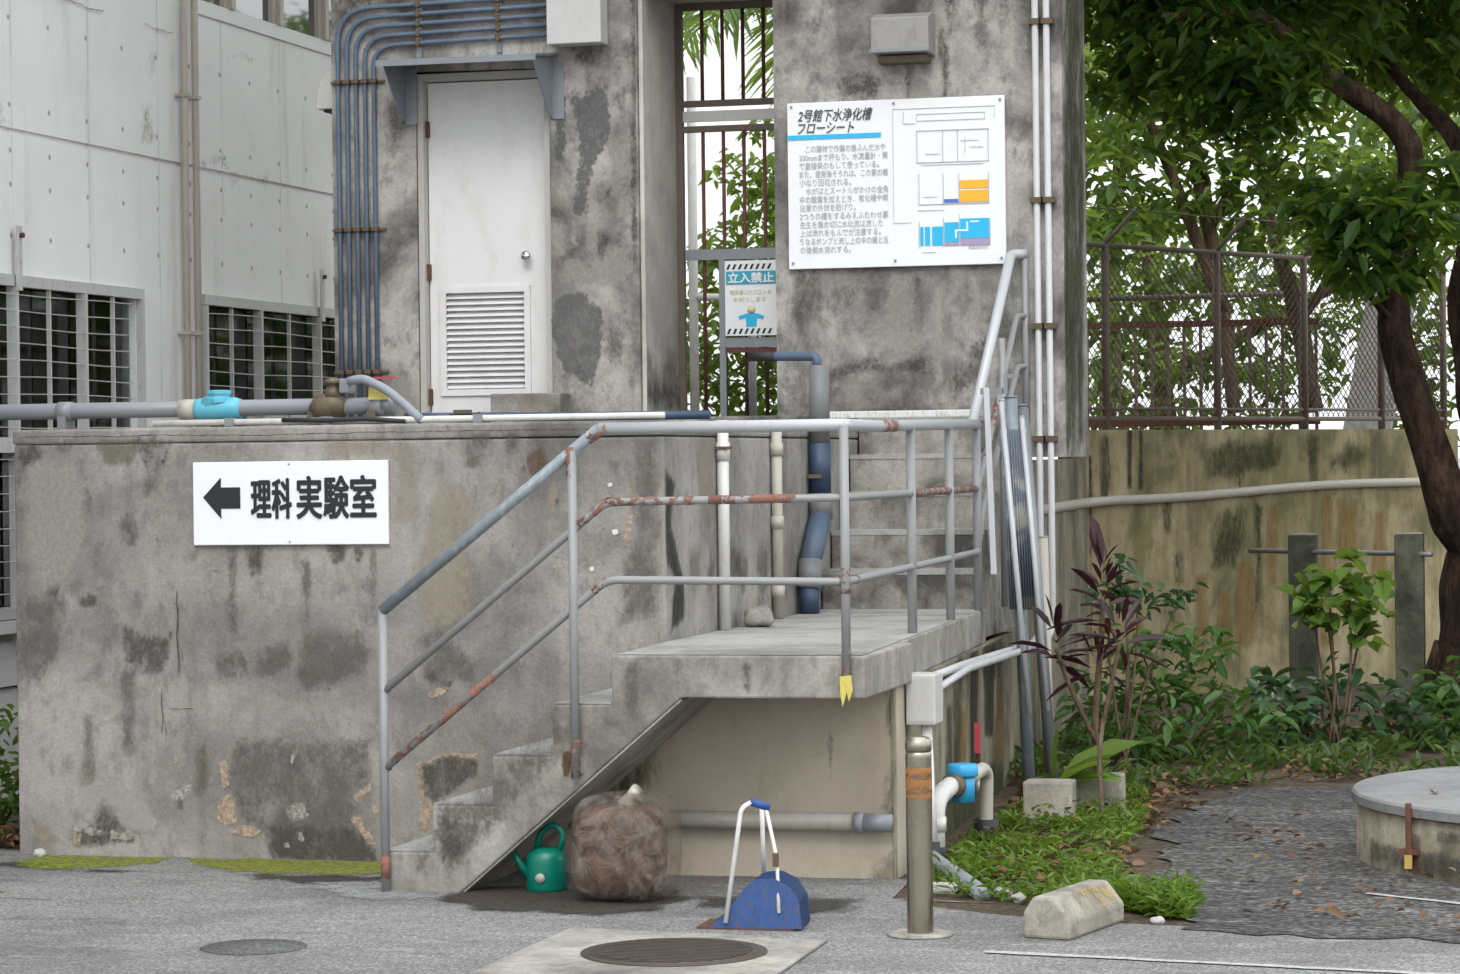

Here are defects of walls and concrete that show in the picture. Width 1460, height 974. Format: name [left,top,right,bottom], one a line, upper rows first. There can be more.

leakage [554,85,611,215]
leakage [551,291,622,386]
rust [577,494,795,527]
rust [916,485,978,497]
leakage [1215,504,1262,601]
leakage [1303,437,1377,480]
leakage [121,626,172,783]
rust [389,672,495,771]
leakage [0,861,130,881]
leakage [231,743,737,915]
leakage [439,711,559,863]
leakage [808,898,861,912]